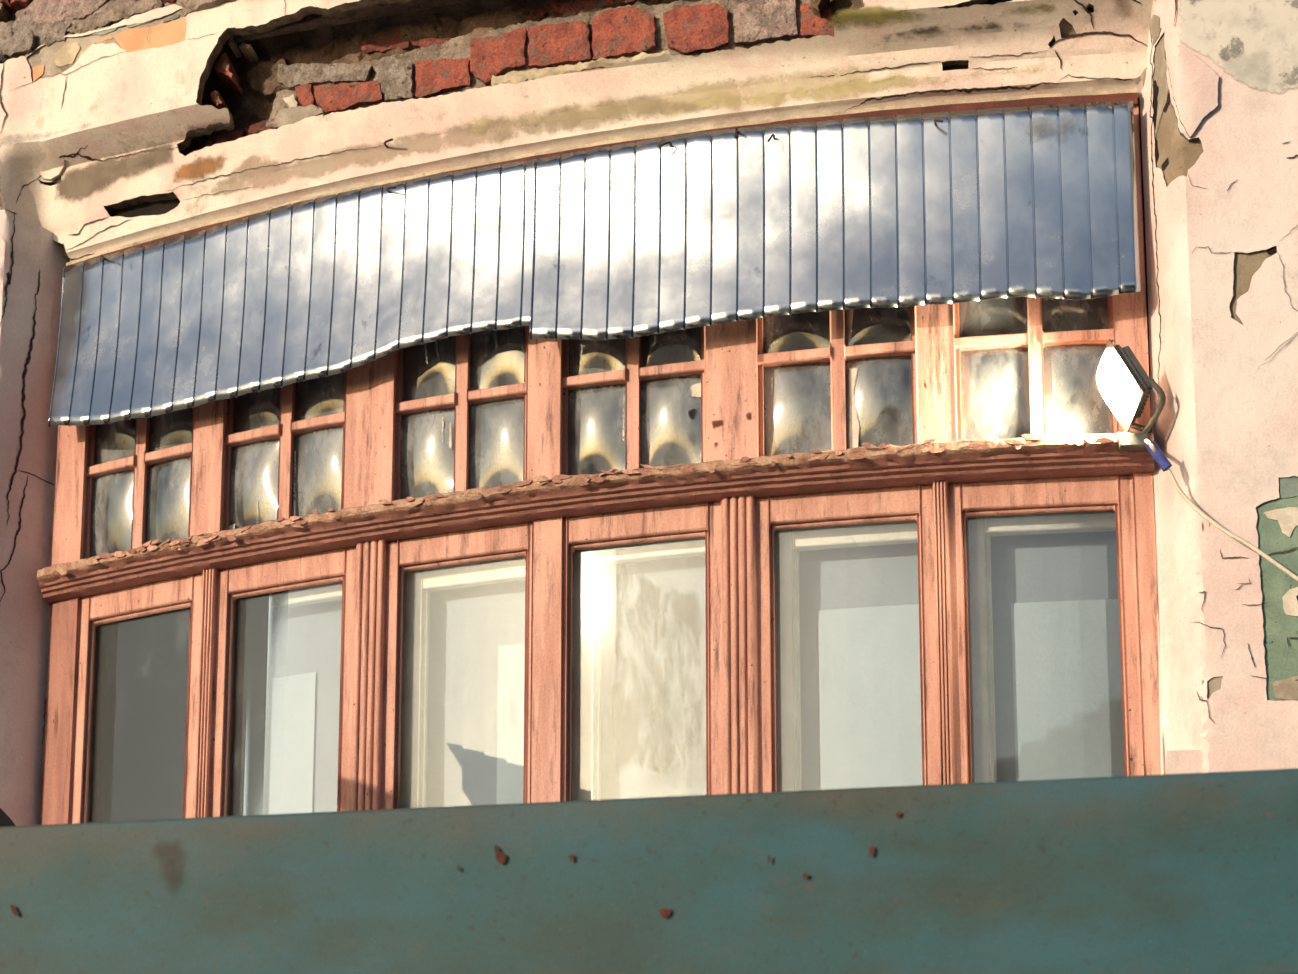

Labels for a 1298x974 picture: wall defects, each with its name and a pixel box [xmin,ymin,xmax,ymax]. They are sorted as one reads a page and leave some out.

peeling [0,0,186,82]
flaking render [195,0,863,151]
flaking render [1149,14,1203,187]
flaking render [108,198,180,218]
crack [166,145,382,200]
crack [808,0,1177,407]
crack [1192,246,1235,254]
crack [1258,225,1298,368]
crack [0,147,178,602]
peeling [1066,432,1123,446]
peeling [89,526,251,565]
peeling [1256,477,1298,701]